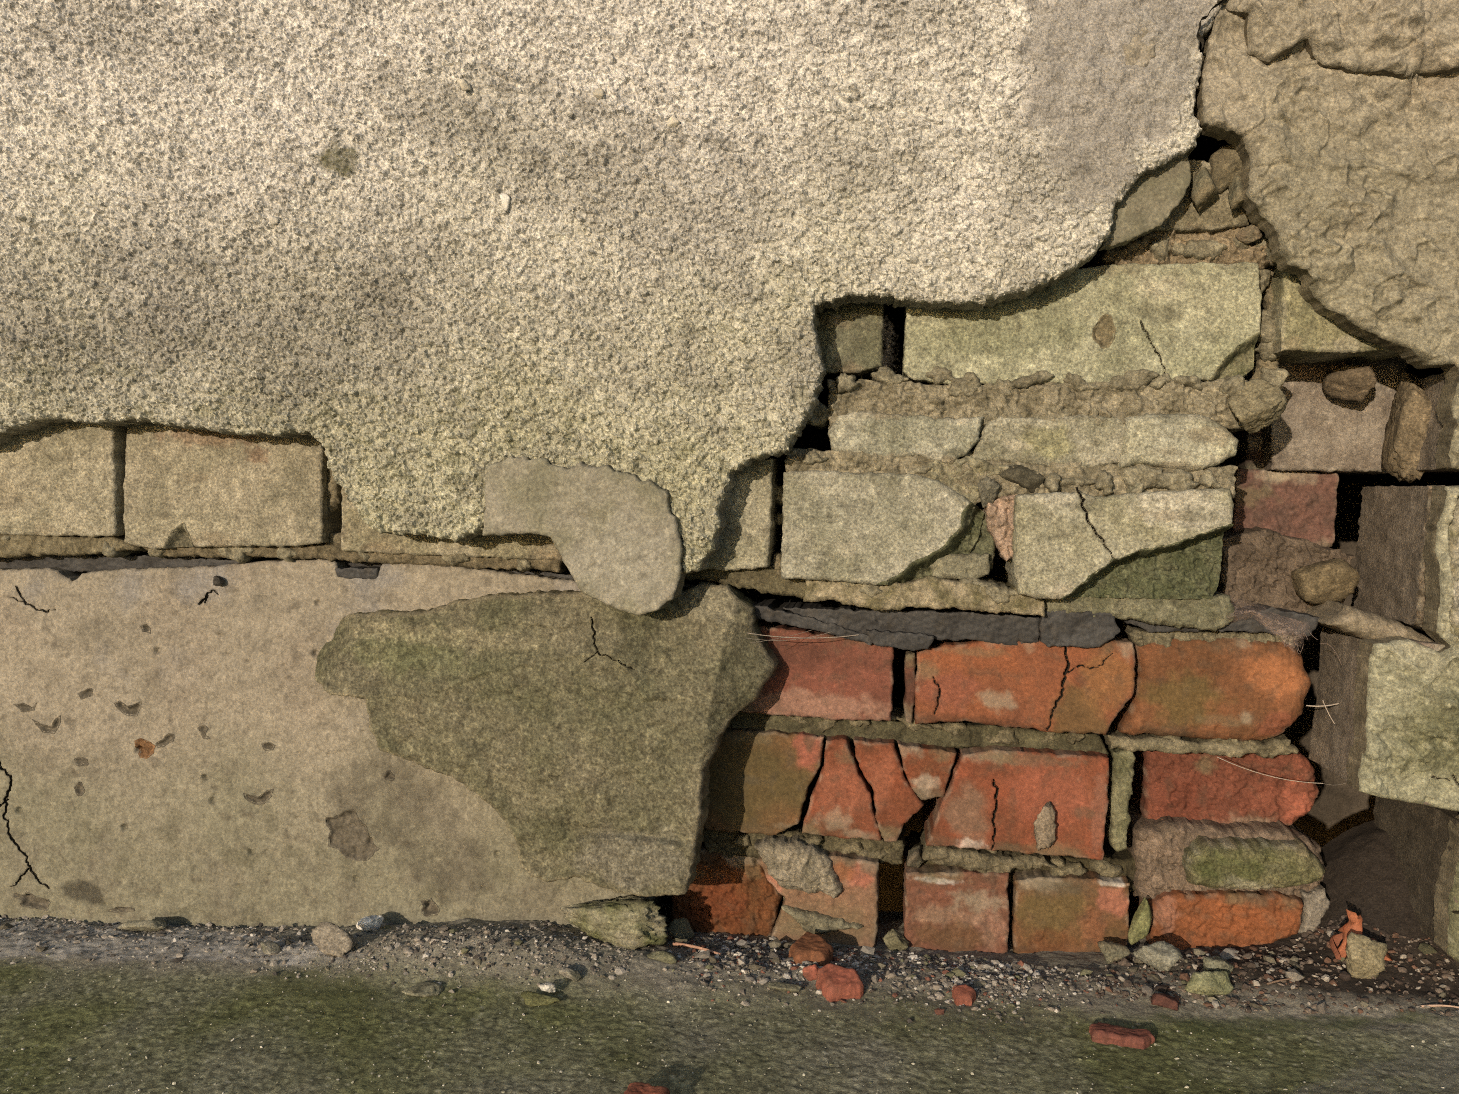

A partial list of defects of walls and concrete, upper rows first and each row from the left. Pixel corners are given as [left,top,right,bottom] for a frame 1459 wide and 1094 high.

crack [1196,0,1227,50]
flaking render [681,5,1459,585]
flaking render [0,410,486,543]
spalling [163,523,194,548]
crack [1076,487,1115,559]
spalling [1061,524,1234,599]
crack [10,586,56,613]
spalling [114,701,142,717]
crack [1046,646,1113,731]
crack [0,761,50,889]
spalling [325,809,379,862]
crack [991,780,999,850]